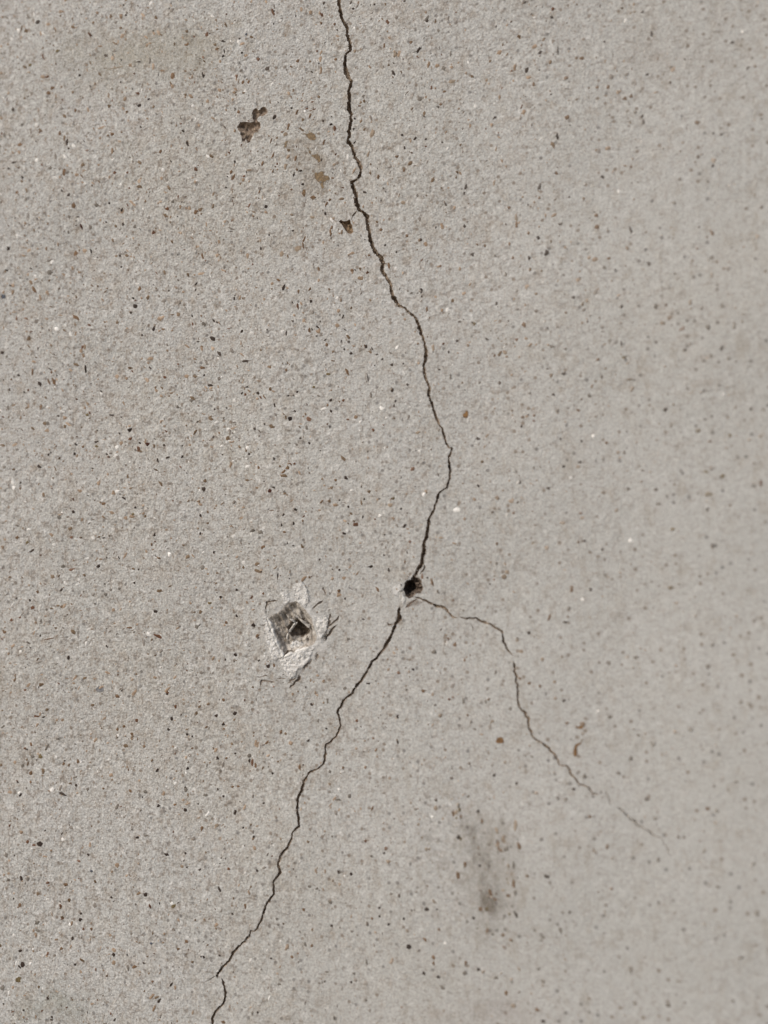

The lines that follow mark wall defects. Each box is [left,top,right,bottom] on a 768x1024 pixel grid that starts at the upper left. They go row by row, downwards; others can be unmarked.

spalling [258,582,339,688]
crack [205,0,672,1024]